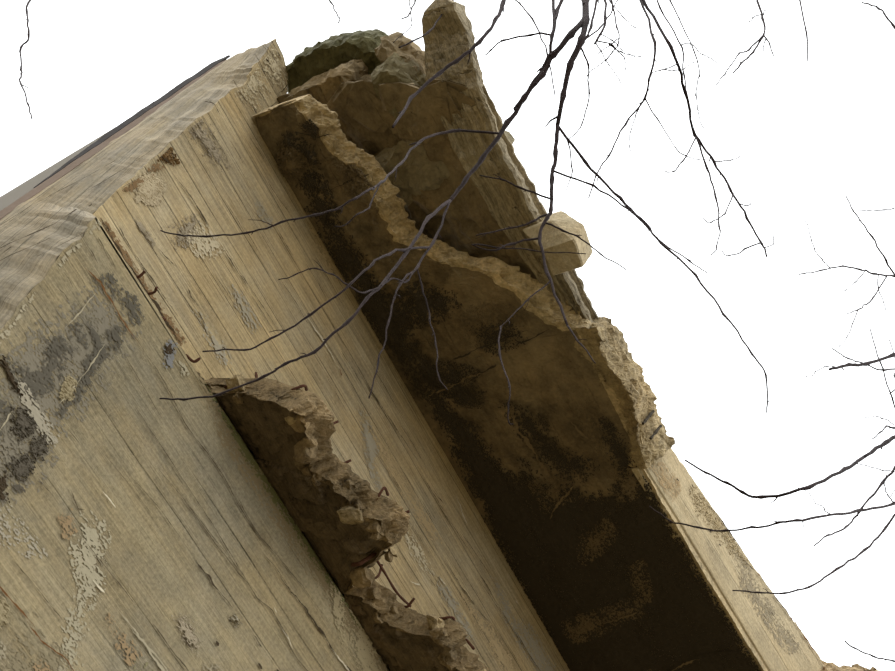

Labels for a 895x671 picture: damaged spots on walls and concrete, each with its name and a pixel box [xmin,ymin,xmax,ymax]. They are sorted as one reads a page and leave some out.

spalling [235,47,288,111]
rust [100,220,187,346]
leakage [0,272,145,559]
crack [60,346,104,403]
spalling [574,316,675,470]
crack [125,331,352,671]
spalling [351,553,415,608]